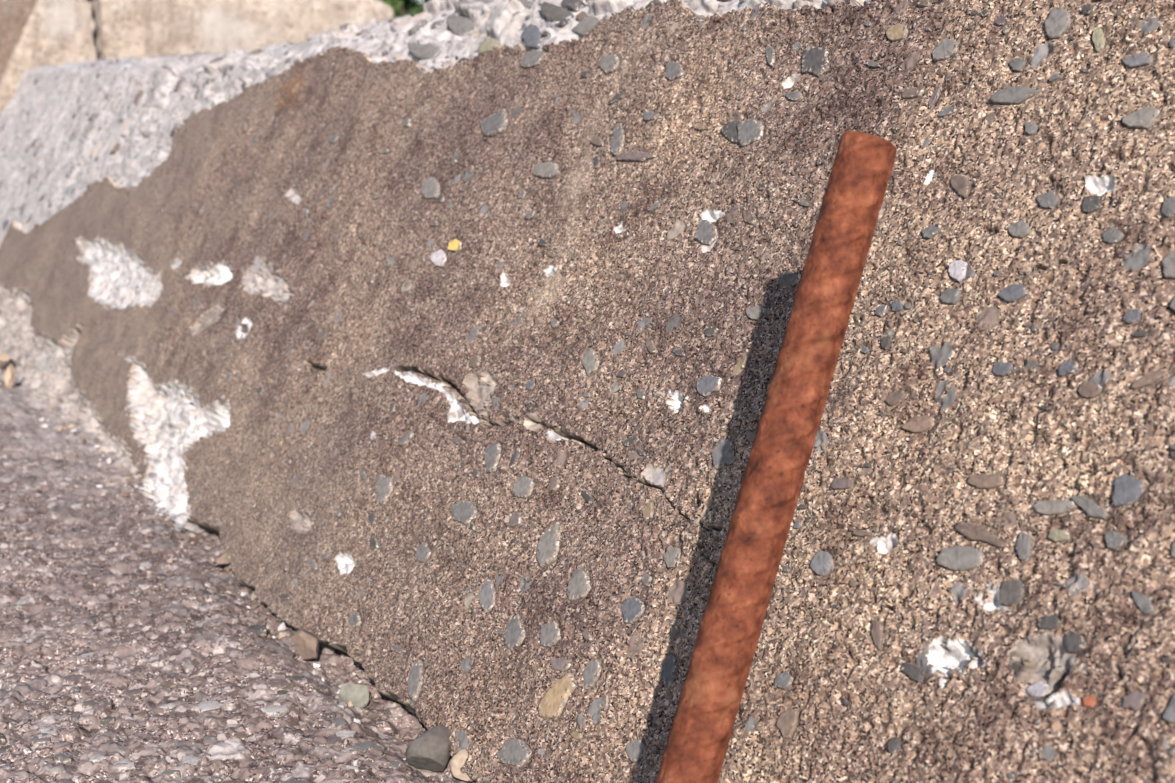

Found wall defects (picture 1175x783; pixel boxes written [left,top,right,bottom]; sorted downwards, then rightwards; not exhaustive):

spalling [681,0,871,18]
peeling [782,74,800,89]
spalling [0,0,667,246]
peeling [1084,173,1116,196]
spalling [71,234,297,310]
peeling [499,272,511,287]
crack [303,359,327,371]
spalling [0,277,232,532]
crack [361,364,728,566]